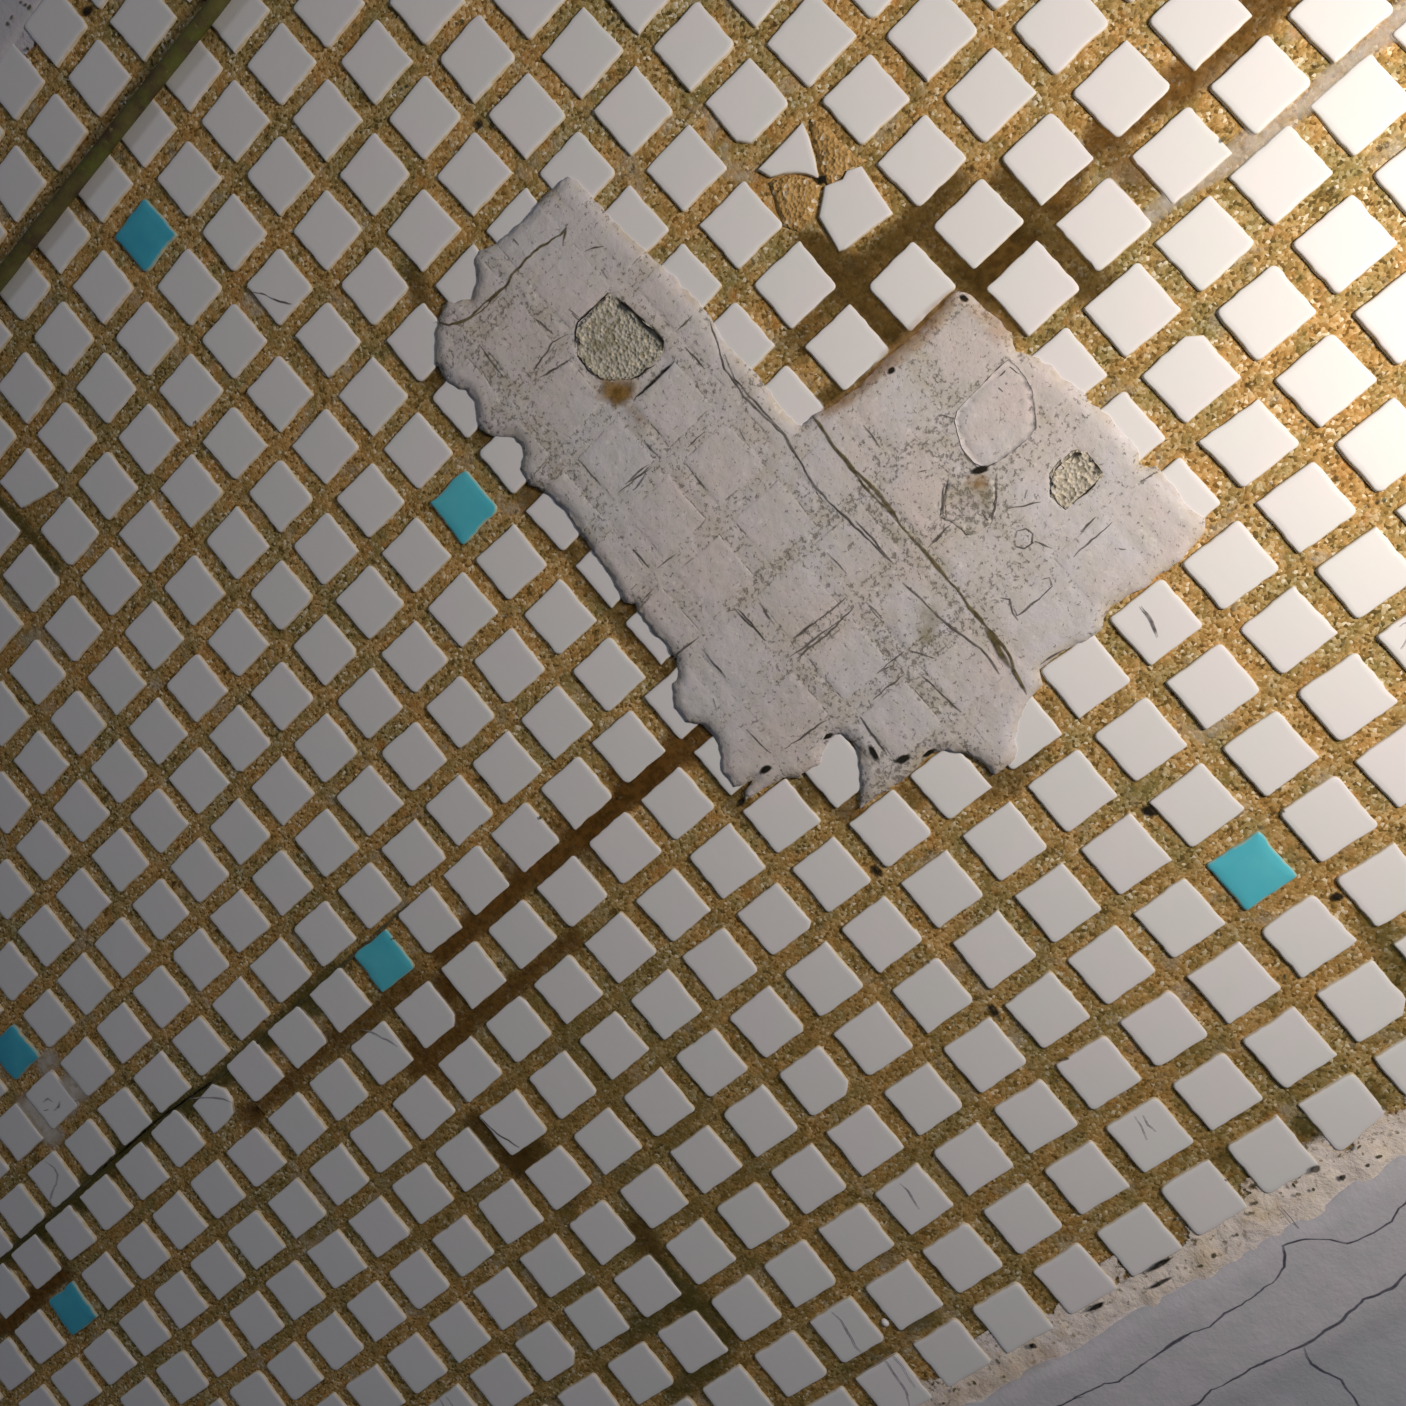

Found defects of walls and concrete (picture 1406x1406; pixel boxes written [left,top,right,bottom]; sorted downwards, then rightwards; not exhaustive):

water stain [1198,4,1406,185]
crack [578,432,706,490]
crack [679,316,1125,695]
crack [632,549,676,602]
crack [670,638,726,710]
crack [749,720,827,753]
crack [861,649,961,756]
water stain [20,1098,60,1145]
crack [1058,1203,1406,1406]